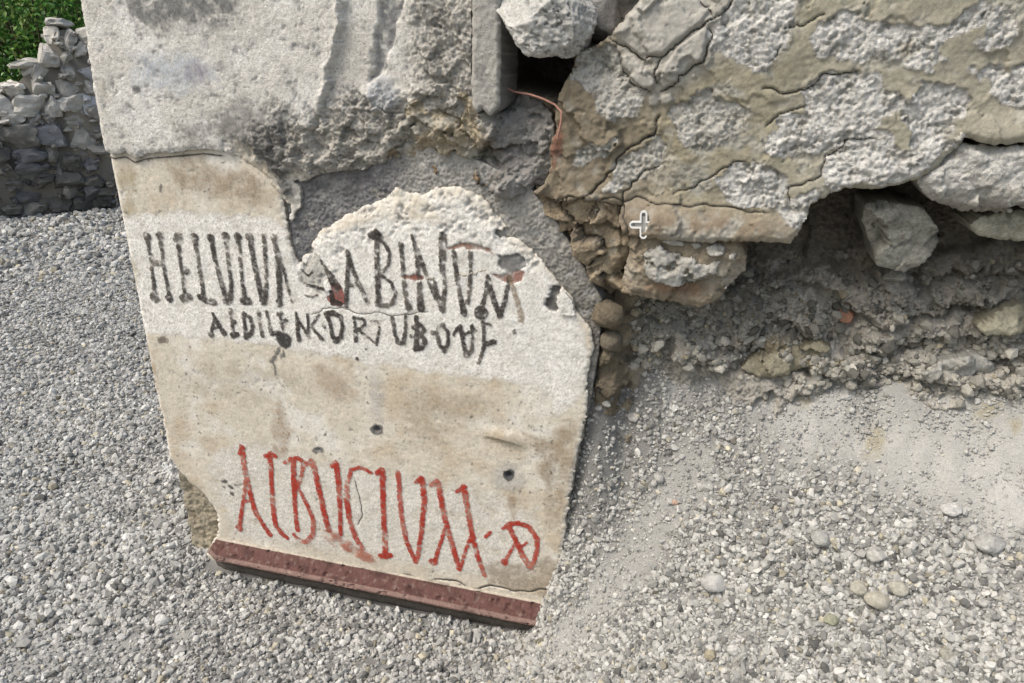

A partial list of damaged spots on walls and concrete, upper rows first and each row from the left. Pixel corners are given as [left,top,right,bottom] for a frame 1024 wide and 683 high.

crack [610,0,733,92]
crack [770,14,824,61]
spalling [667,88,751,151]
crack [763,72,852,126]
spalling [706,0,1024,229]
crack [106,153,222,163]
crack [553,117,766,234]
crack [787,137,874,201]
spalling [298,254,325,293]
spalling [447,242,526,283]
peeling [545,285,576,316]